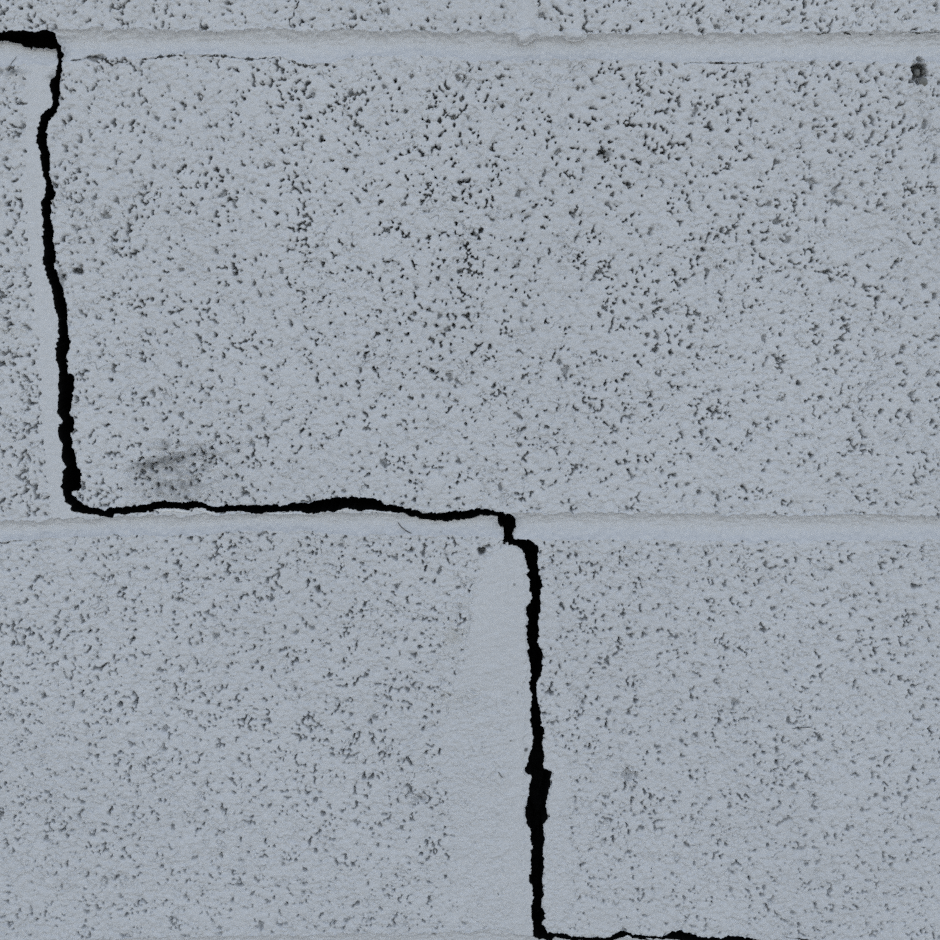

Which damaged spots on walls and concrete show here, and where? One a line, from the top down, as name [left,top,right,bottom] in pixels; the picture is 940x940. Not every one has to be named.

crack [0,30,757,940]
crack [692,58,769,66]